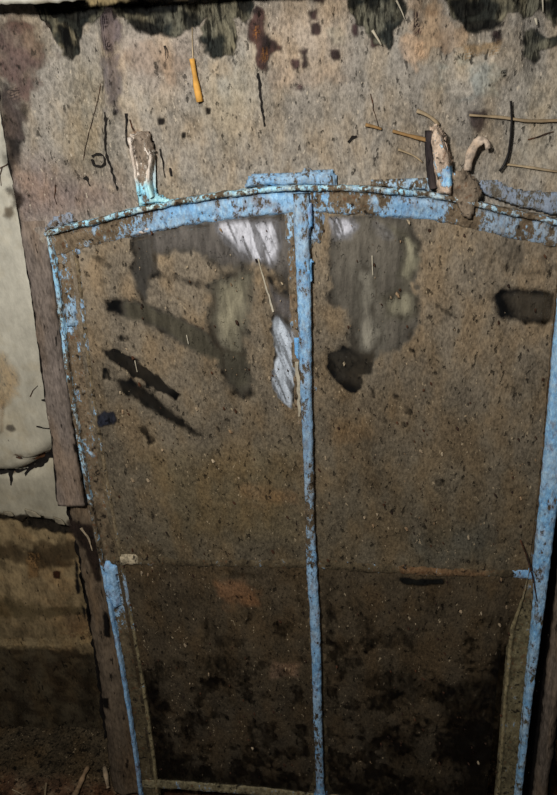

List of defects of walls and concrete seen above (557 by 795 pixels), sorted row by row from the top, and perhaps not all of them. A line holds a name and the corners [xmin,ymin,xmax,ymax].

rust [248,6,281,71]